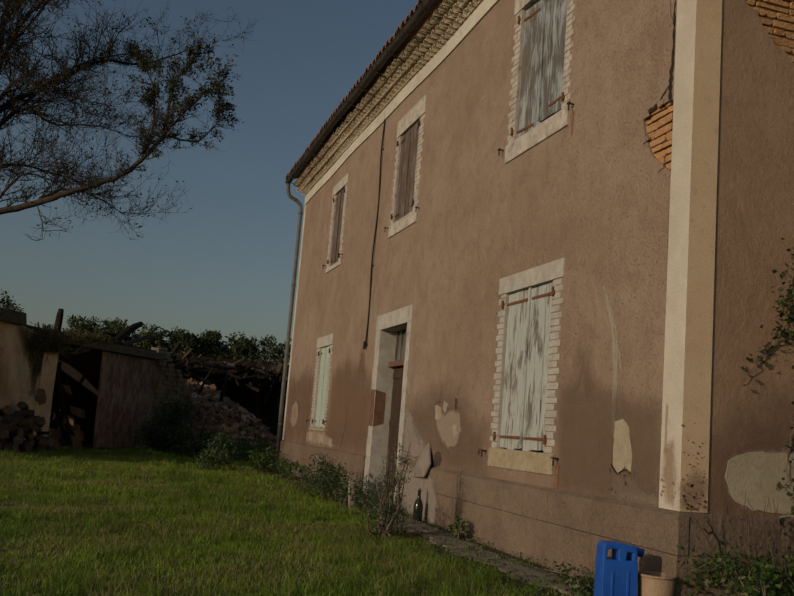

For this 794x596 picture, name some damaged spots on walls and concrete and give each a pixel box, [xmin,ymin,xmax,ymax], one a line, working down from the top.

spalling [745,0,794,63]
spalling [642,99,674,172]
spalling [435,395,461,447]
peeling [608,419,708,511]